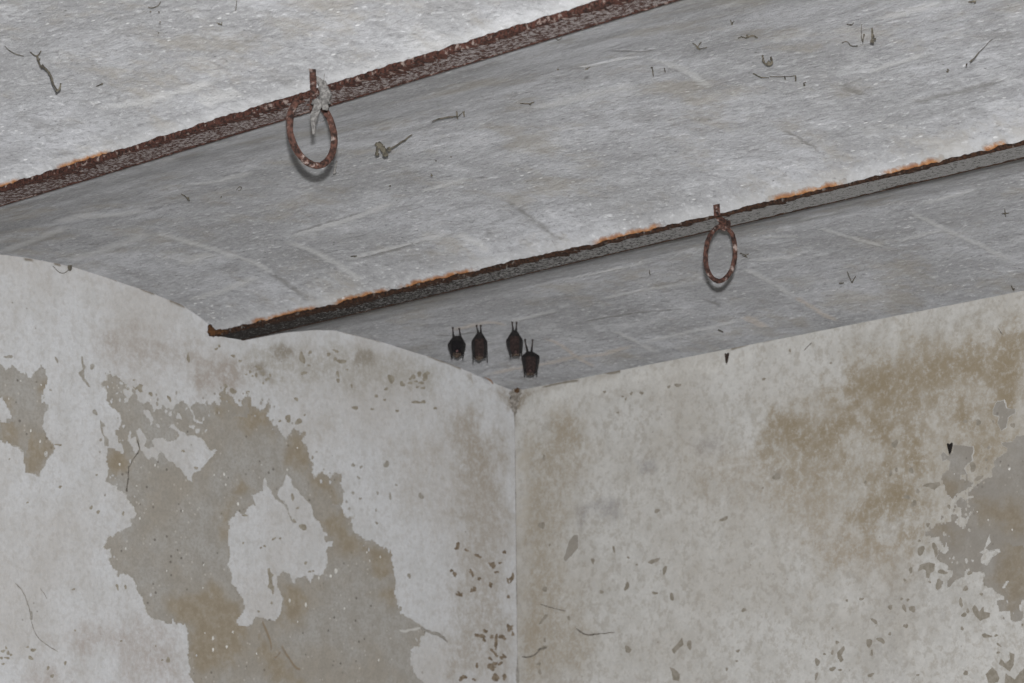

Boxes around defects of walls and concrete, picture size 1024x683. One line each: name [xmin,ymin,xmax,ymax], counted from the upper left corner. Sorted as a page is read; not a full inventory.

rust [51,147,113,169]
rust [765,178,848,202]
rust [877,154,945,176]
rust [589,220,666,245]
rust [245,266,480,324]
peeling [0,355,62,477]
spalling [371,371,437,410]
crack [126,440,140,492]
water stain [76,291,1024,683]
peeling [79,356,426,683]
peeling [903,400,1024,630]
spalling [982,633,1024,683]